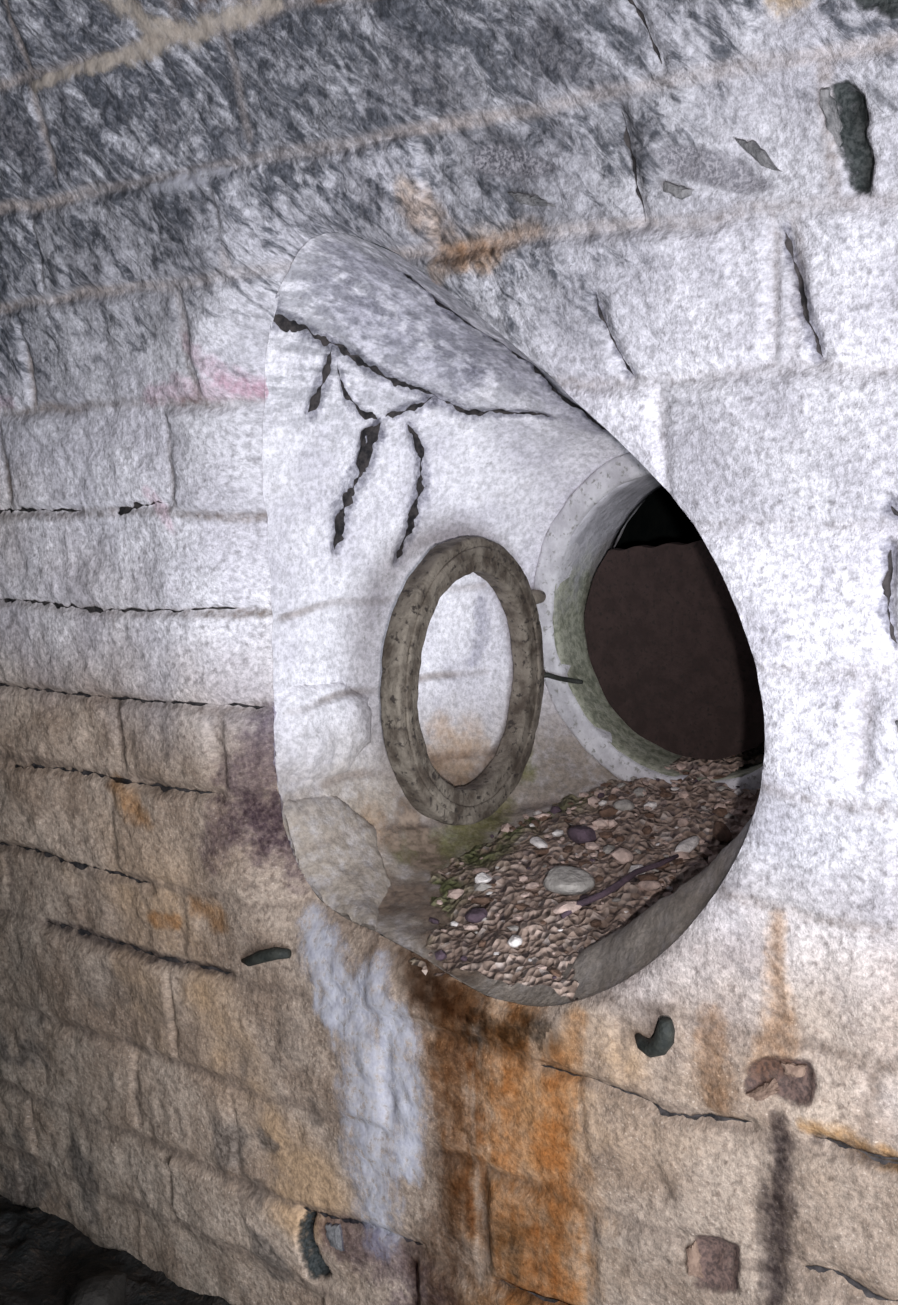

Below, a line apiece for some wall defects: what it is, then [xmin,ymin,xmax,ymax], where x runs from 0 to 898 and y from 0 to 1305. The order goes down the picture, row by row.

crack [273,273,608,559]
efflorescence [302,908,422,1257]
spalling [745,1056,817,1106]
spalling [686,1235,740,1293]
water stain [765,1118,791,1305]